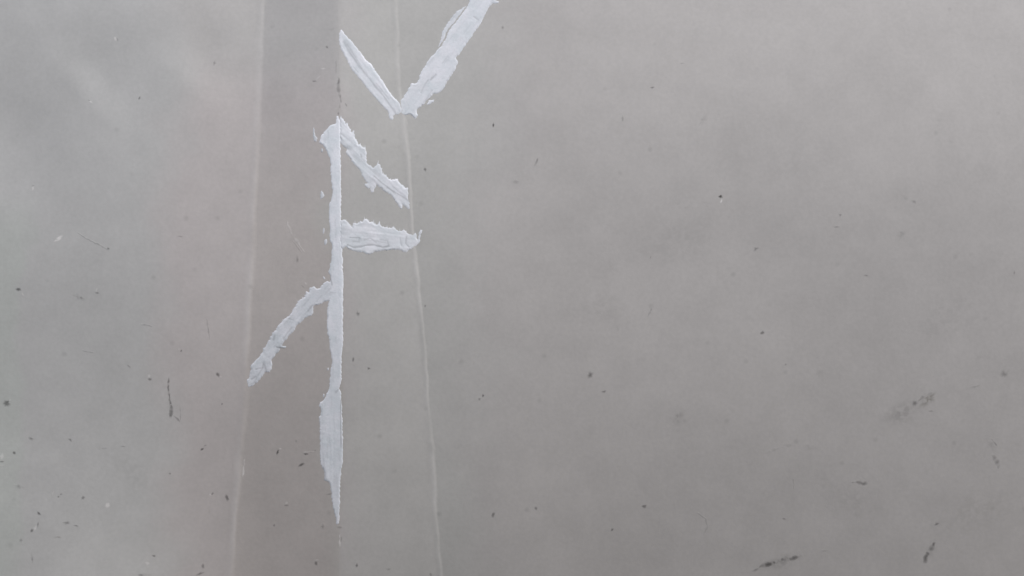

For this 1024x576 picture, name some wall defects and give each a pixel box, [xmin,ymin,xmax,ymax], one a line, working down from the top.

peeling [325,0,499,120]
peeling [247,103,422,547]